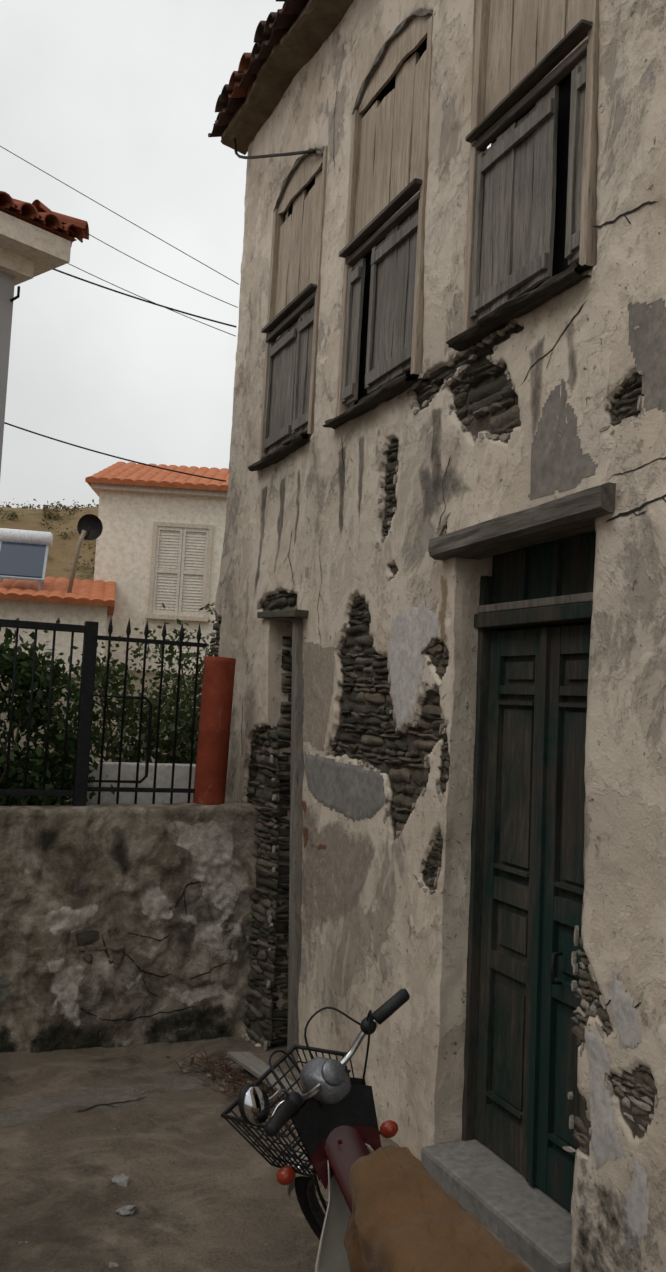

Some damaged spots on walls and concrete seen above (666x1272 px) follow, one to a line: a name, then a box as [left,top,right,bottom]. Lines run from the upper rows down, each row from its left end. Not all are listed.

spalling [405,323,523,442]
flaking render [528,379,598,500]
flaking render [599,298,666,432]
crack [606,494,666,522]
crack [609,457,666,479]
spalling [139,596,450,1051]
crack [79,881,228,1021]
damp [0,1026,15,1053]
damp [30,1026,123,1053]
damp [147,1005,230,1044]
peeling [562,925,659,1256]
mould [575,1184,639,1272]